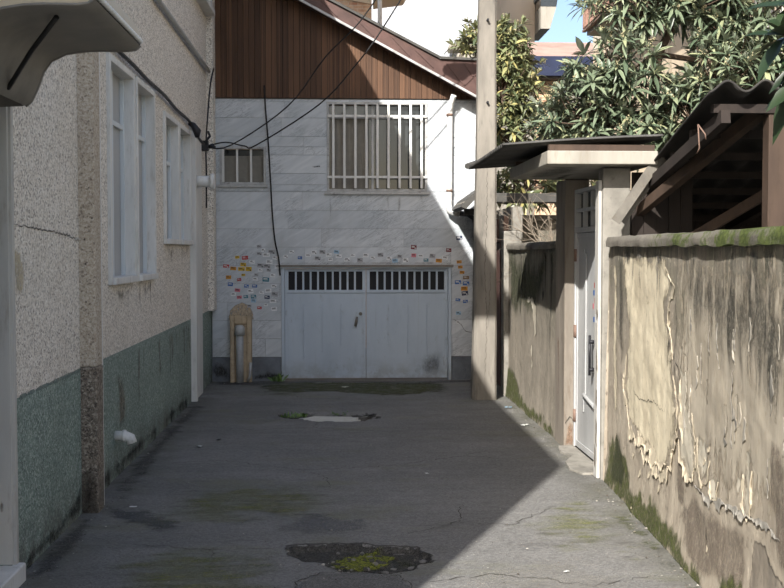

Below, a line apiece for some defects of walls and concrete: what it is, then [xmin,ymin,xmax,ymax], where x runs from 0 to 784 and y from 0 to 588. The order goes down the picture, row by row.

leakage [509,255,553,310]
peeling [527,296,536,369]
peeling [613,245,784,542]
leakage [690,255,784,387]